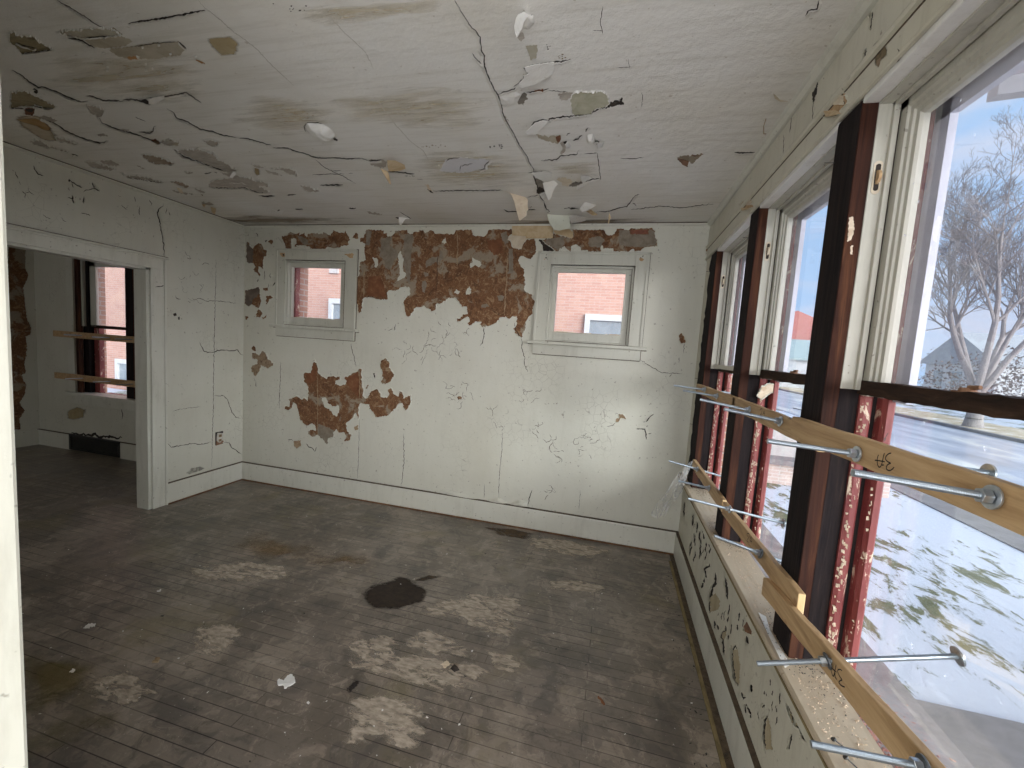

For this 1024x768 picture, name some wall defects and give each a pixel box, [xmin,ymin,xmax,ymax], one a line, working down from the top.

peeling [8,30,53,56]
peeling [55,26,205,72]
crack [11,70,536,215]
crack [452,1,641,179]
peeling [499,88,624,155]
peeling [7,247,32,431]
crack [15,165,241,466]
peeling [284,357,412,451]
peeling [244,171,658,338]
crack [445,383,503,495]
crack [514,323,599,504]
water stain [364,575,438,609]